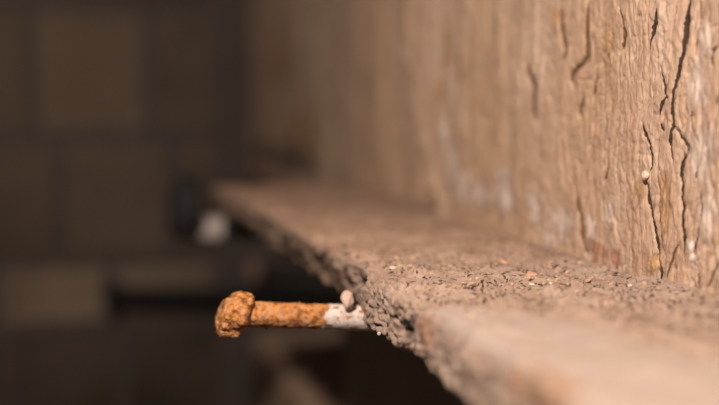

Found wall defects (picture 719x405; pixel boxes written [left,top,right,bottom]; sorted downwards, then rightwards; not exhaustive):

crack [559,1,598,116]
crack [641,0,719,290]